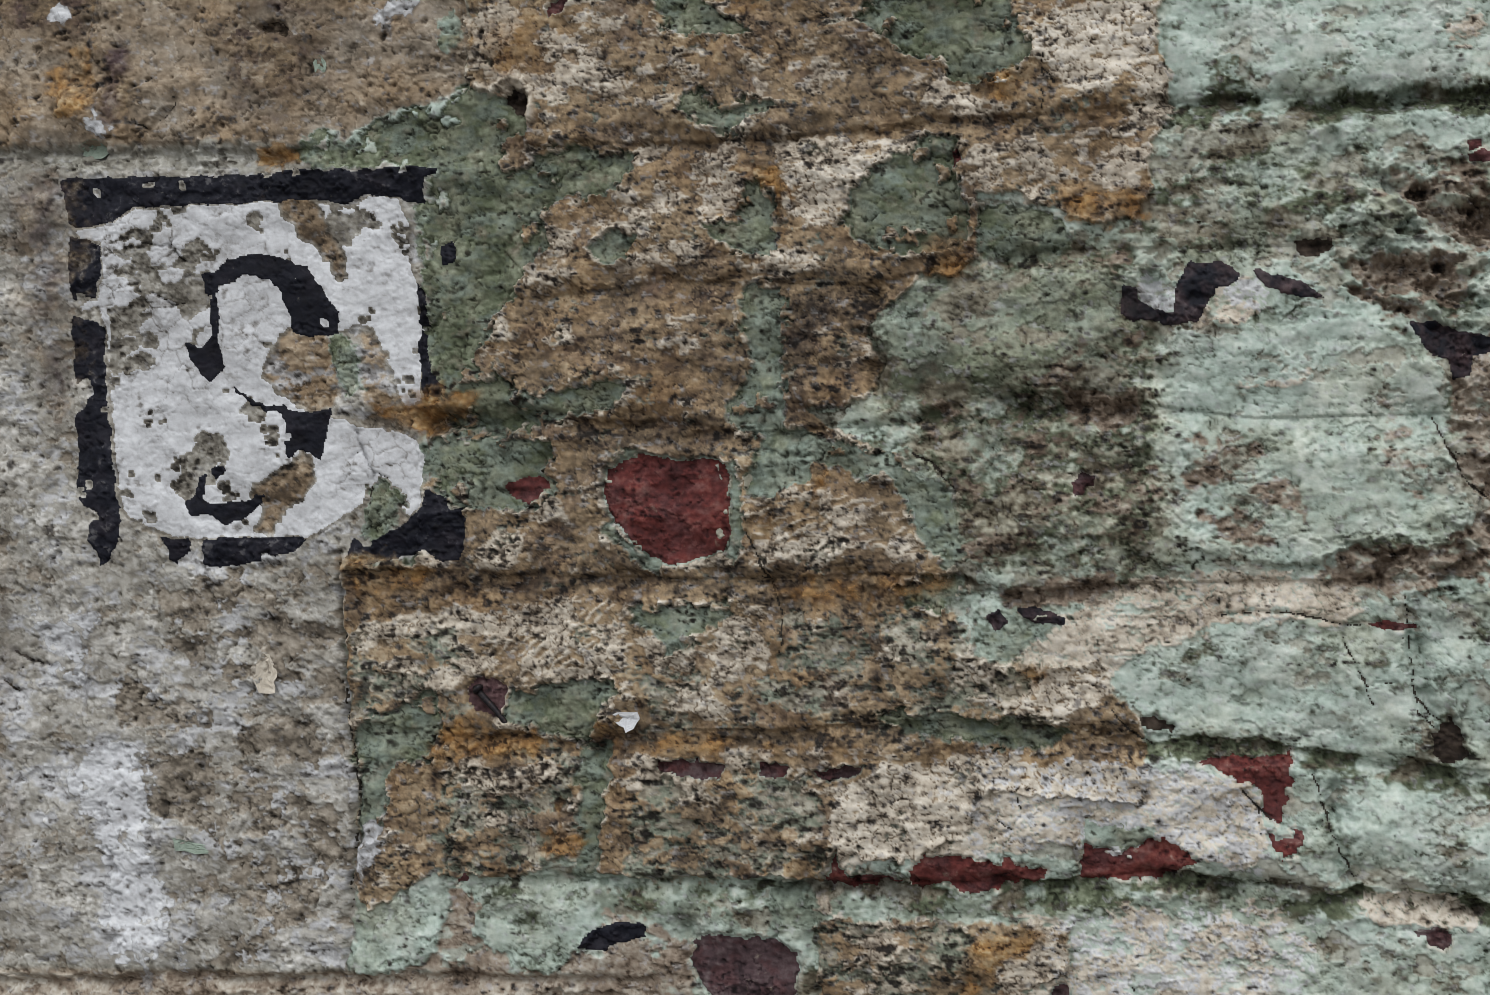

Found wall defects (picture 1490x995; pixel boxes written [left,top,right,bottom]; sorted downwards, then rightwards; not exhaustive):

peeling [860,0,1031,84]
peeling [297,84,633,515]
spalling [267,331,392,411]
peeling [596,285,1109,667]
crack [1221,596,1450,728]
peeling [574,712,640,876]
flaking render [657,758,725,780]
flaking render [814,764,862,782]
flaking render [824,854,1047,894]
flaking render [1073,811,1197,881]
flaking render [1199,748,1304,862]
flaking render [690,934,800,995]